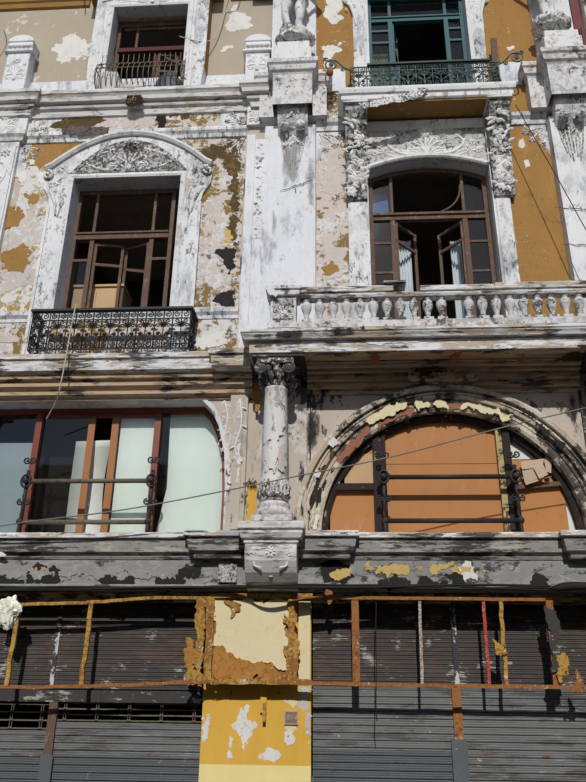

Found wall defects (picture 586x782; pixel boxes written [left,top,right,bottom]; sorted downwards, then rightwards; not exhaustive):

peeling [225,4,253,32]
peeling [323,0,344,24]
peeling [322,42,343,68]
peeling [5,95,190,229]
peeling [200,137,242,307]
peeling [0,243,32,273]
peeling [308,394,566,530]
peeling [320,560,355,583]
peeling [365,560,489,591]
peeling [227,704,258,758]
peeling [284,686,312,746]
peeling [258,747,281,762]